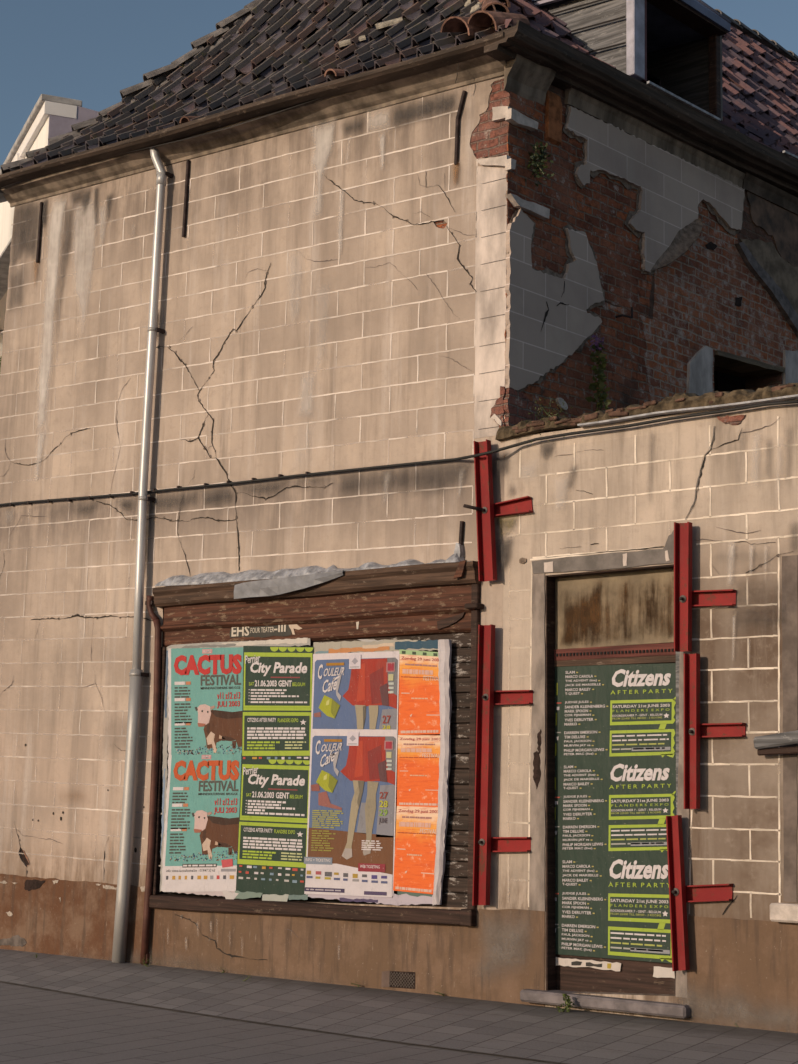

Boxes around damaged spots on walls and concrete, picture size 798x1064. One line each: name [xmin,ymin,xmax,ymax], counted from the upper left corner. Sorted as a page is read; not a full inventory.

water stain [14,189,111,462]
crack [324,174,476,291]
flaking render [470,79,798,428]
crack [4,428,90,475]
crack [97,263,332,573]
crack [685,421,793,573]
crack [31,614,153,707]
flaking render [0,879,59,891]